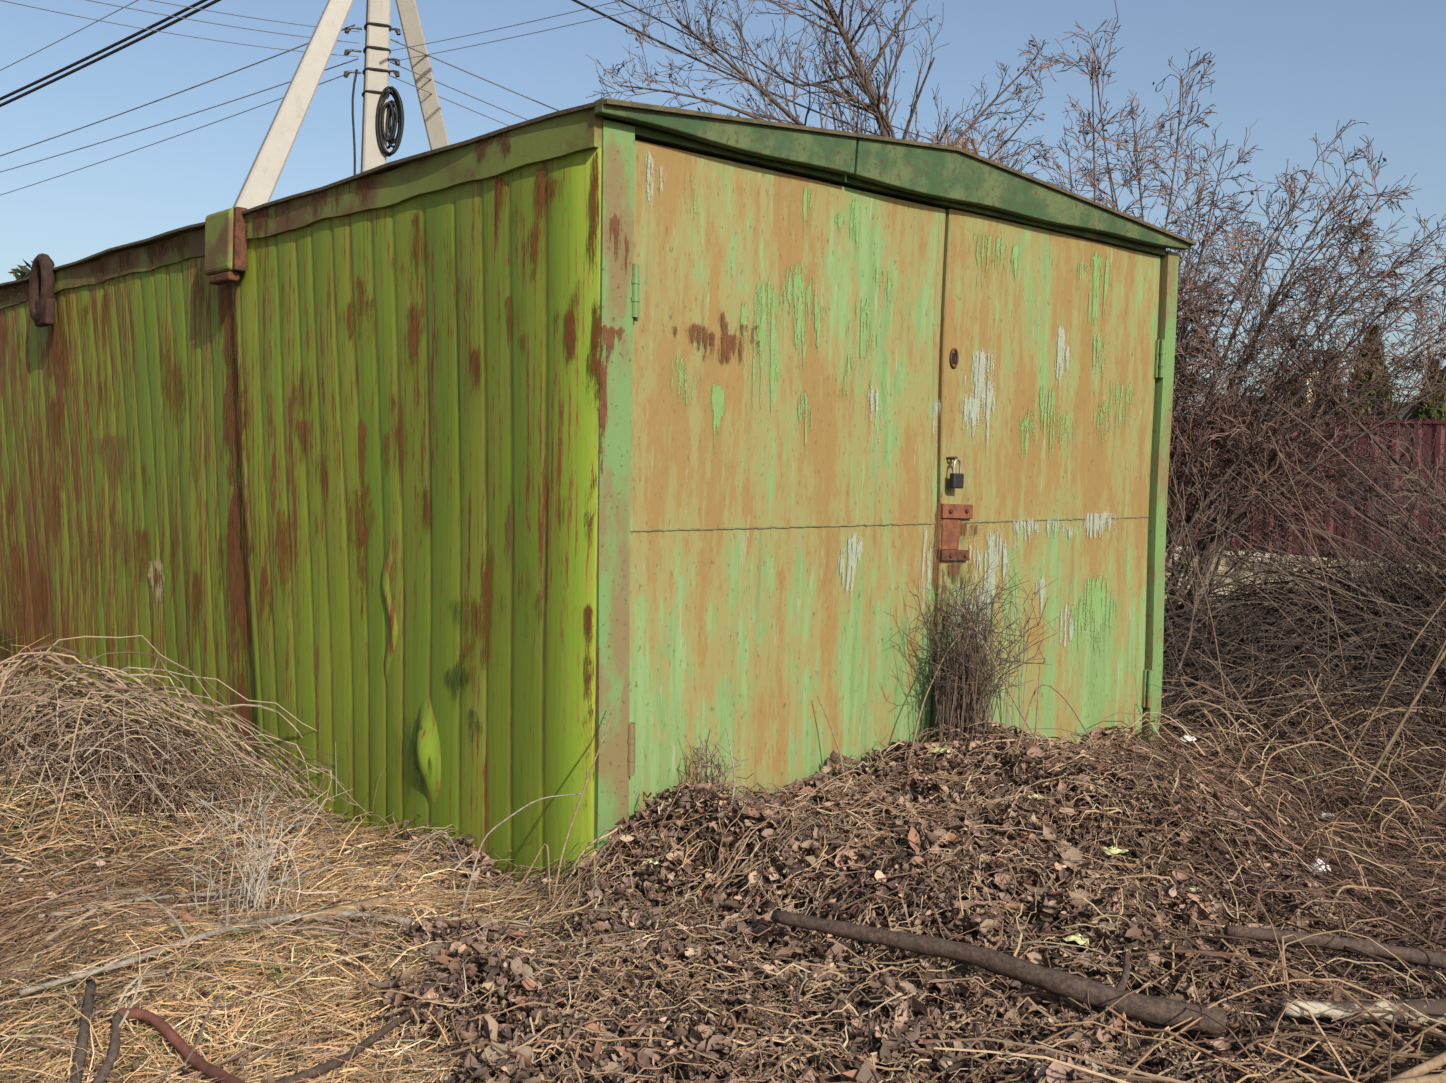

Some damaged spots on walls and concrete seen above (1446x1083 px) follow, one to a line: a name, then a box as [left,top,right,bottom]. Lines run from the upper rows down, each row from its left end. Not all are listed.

corrosion [244,201,289,241]
corrosion [496,167,563,280]
corrosion [556,151,630,487]
corrosion [674,309,760,363]
peeling [963,348,995,447]
peeling [148,558,165,604]
corrosion [196,269,292,765]
corrosion [349,417,374,613]
corrosion [458,499,542,694]
peeling [838,532,862,599]
corrosion [932,492,977,640]
corrosion [581,603,598,780]